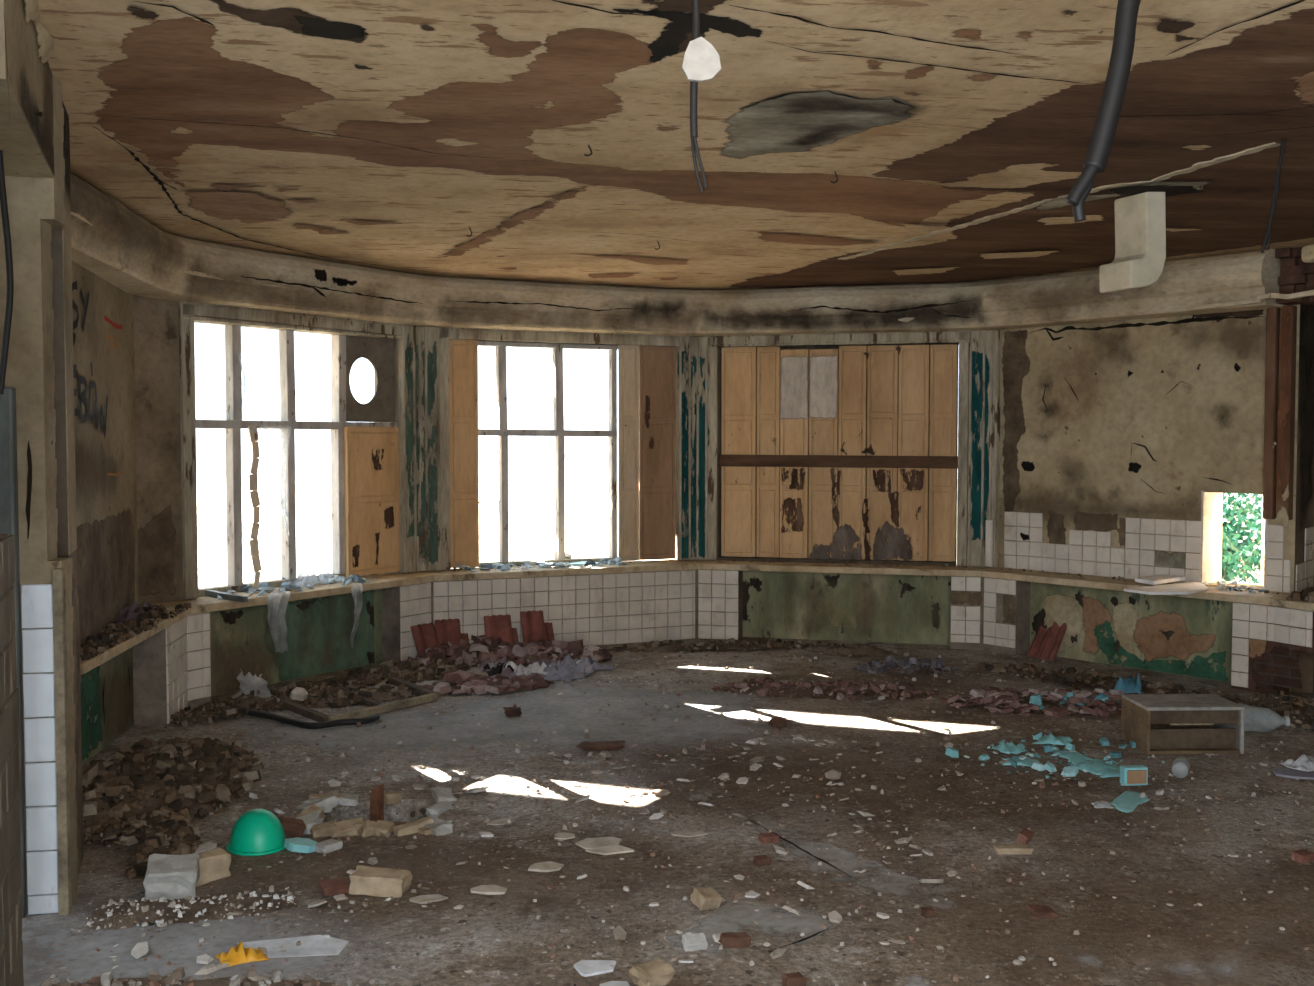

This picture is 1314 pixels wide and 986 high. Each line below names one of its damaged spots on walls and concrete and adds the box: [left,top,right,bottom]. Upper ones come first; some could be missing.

crack [1167,0,1305,55]
peeling [95,6,1314,322]
water stain [721,91,917,159]
water stain [609,297,980,330]
peeling [375,341,438,565]
peeling [678,351,710,559]
peeling [780,356,838,419]
peeling [809,442,924,588]
spalling [970,329,1035,541]
peeling [1047,512,1126,545]
spalling [72,506,176,874]
peeling [1031,591,1228,681]